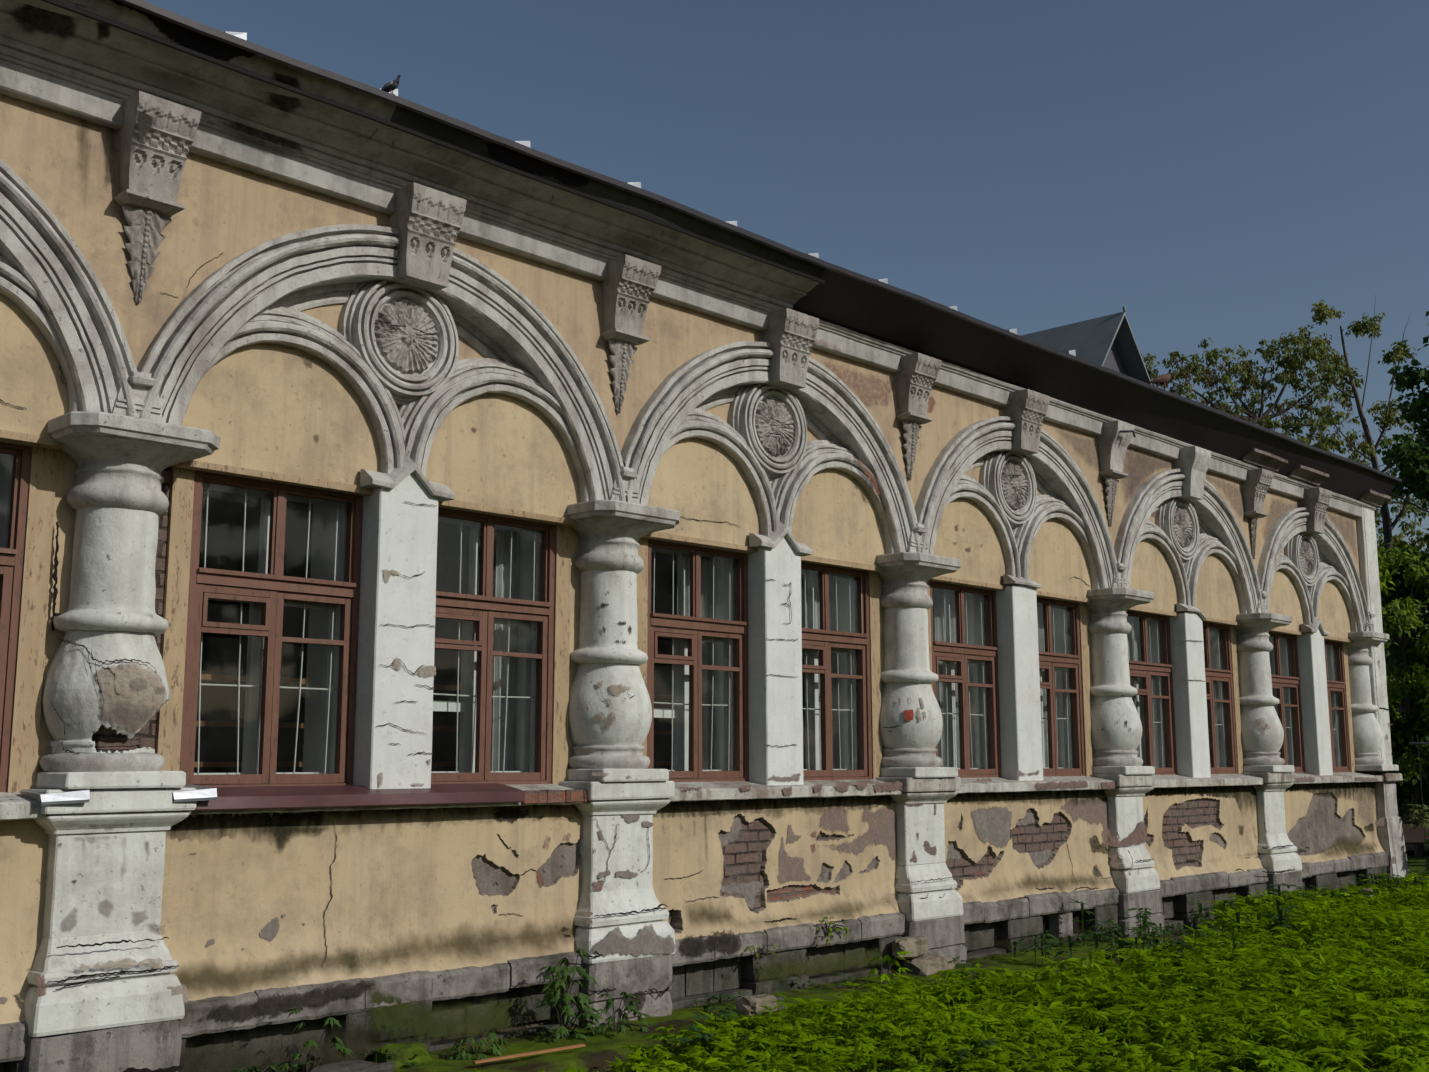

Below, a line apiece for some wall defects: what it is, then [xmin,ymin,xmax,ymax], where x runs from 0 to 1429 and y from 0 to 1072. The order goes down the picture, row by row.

flaking render [152,466,172,654]
spalling [96,663,167,749]
crack [322,822,337,968]
damp [177,925,578,989]
peeling [494,808,542,823]
spalling [471,831,604,914]
peeling [593,870,638,891]
peeling [592,909,683,957]
damp [690,908,730,922]
spalling [718,770,1227,914]
spalling [1287,776,1366,856]
crack [123,1064,183,1072]